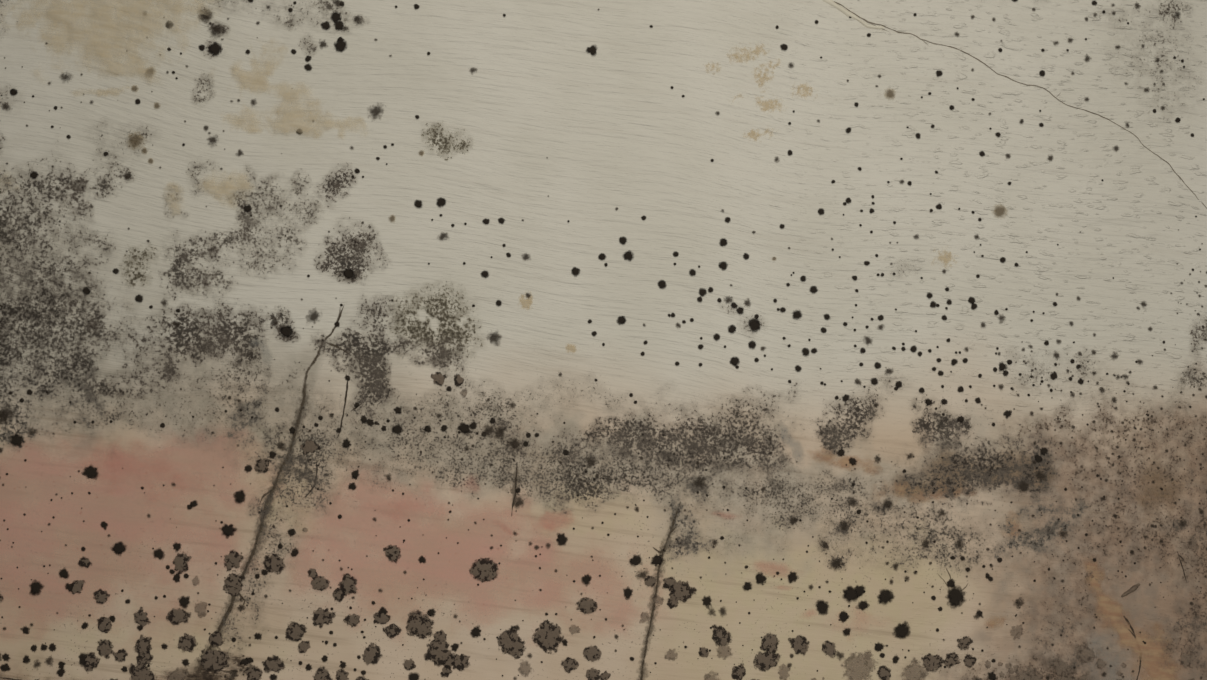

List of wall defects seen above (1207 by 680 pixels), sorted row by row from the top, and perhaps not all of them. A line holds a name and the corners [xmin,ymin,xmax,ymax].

mould [199,0,368,71]
mould [1085,0,1205,123]
mould [415,115,472,160]
crack [823,0,1207,208]
mould [307,218,386,284]
mould [431,198,467,240]
leakage [619,237,633,261]
mould [689,266,773,370]
mould [927,269,952,320]
crack [197,306,365,673]
crack [640,502,681,680]
mould [290,631,366,675]